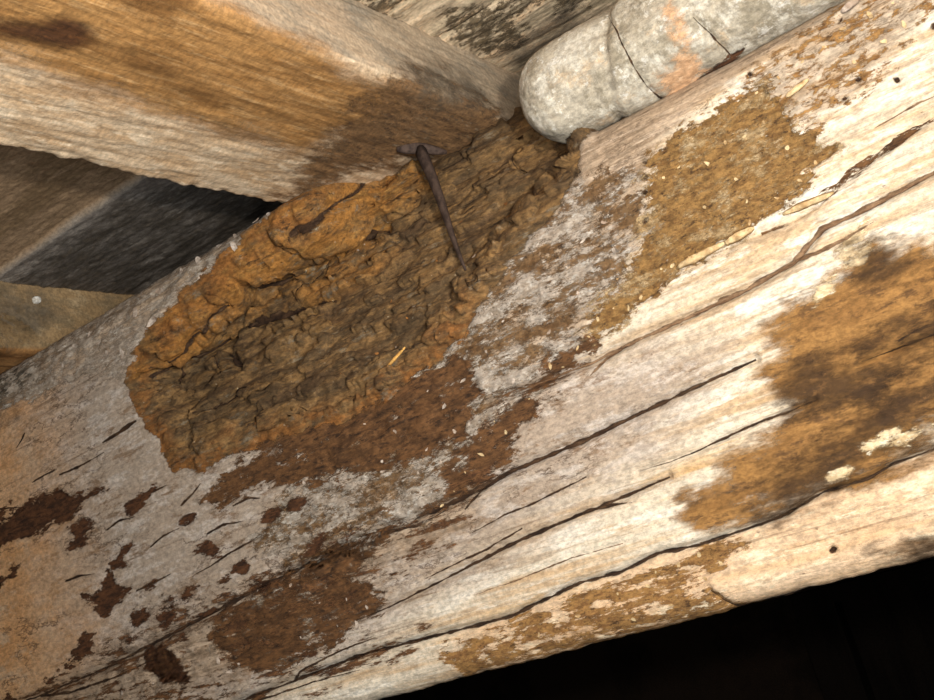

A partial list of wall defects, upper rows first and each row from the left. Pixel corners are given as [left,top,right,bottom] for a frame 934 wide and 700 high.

water stain [0,0,406,154]
water stain [21,185,272,295]
crack [287,183,365,243]
crack [365,229,390,241]
crack [476,97,934,410]
crack [149,261,337,414]
water stain [673,238,934,531]
crack [27,359,934,700]